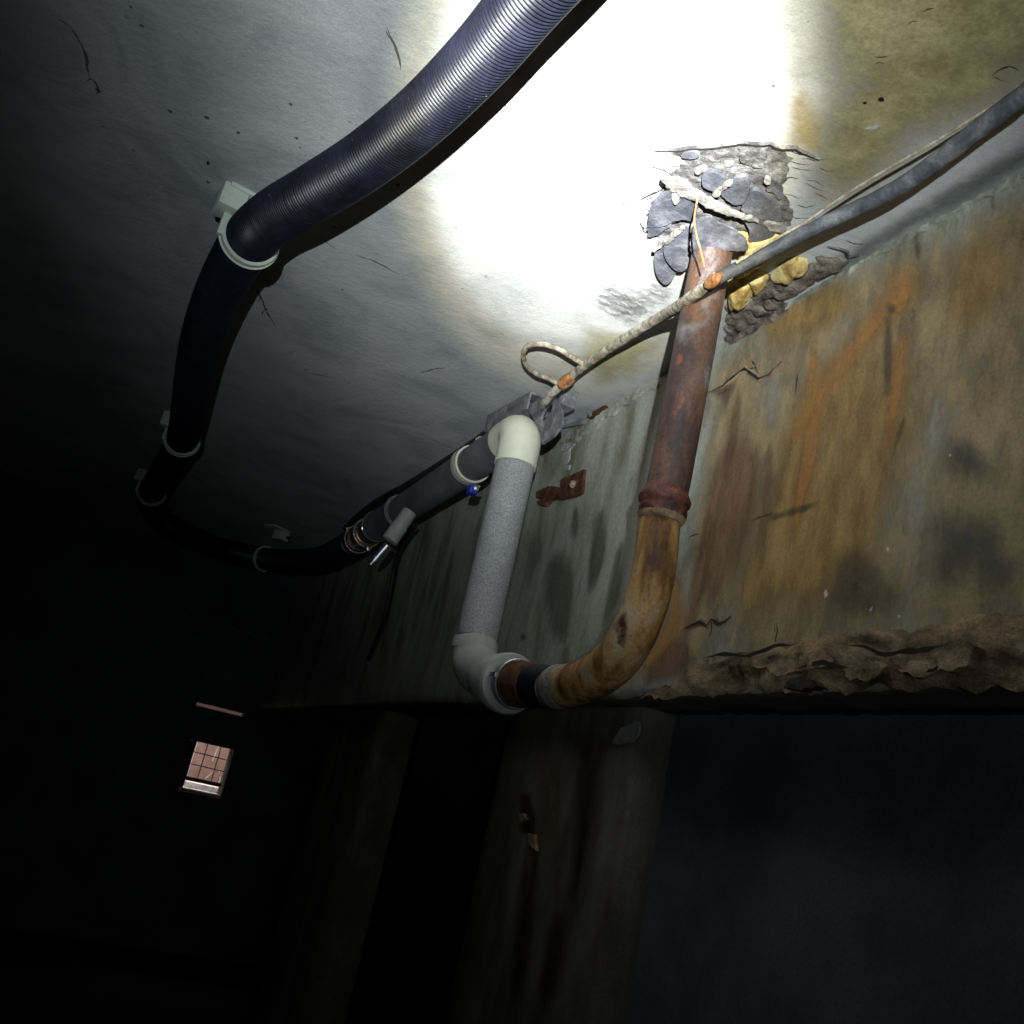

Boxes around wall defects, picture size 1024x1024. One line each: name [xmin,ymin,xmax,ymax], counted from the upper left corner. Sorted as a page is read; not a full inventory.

crack [61,20,101,94]
spalling [597,145,794,322]
spalling [723,256,849,345]
crack [708,360,798,395]
corrosion [742,280,911,608]
crack [683,616,731,637]
spalling [639,611,1024,700]